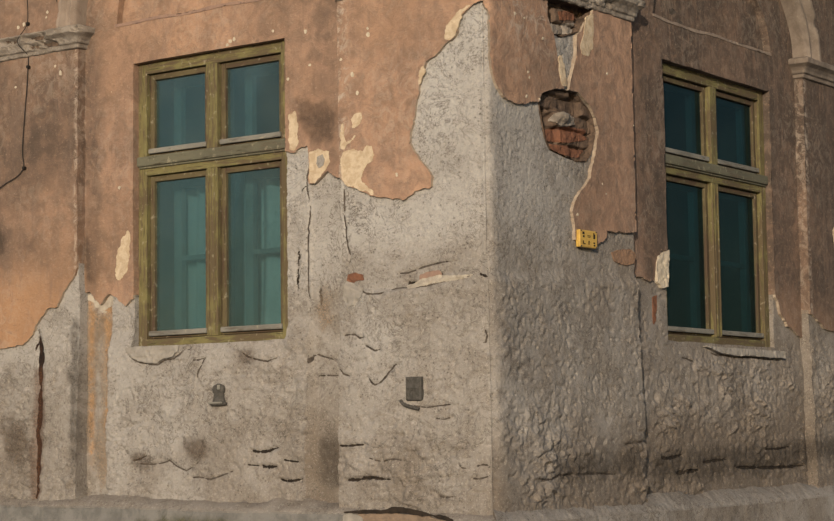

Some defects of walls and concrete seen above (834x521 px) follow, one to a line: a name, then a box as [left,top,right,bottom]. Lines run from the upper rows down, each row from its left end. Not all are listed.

peeling [288,111,299,151]
flaking render [0,147,364,503]
crack [302,167,311,312]
crack [343,189,351,263]
flaking render [338,1,834,520]